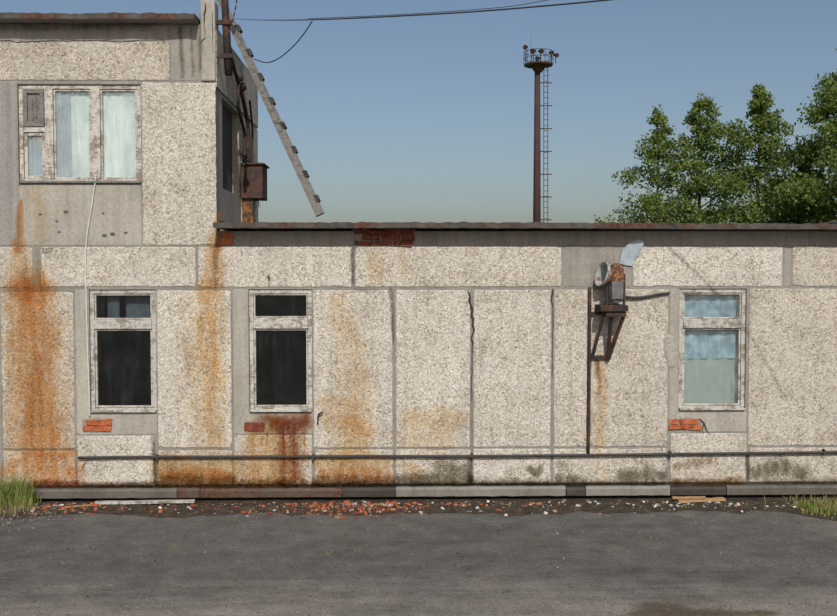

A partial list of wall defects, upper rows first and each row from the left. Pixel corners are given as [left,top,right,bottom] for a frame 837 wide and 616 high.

flaking render [353,228,416,248]
crack [465,290,475,392]
corrosion [31,479,79,488]
corrosion [261,413,312,488]